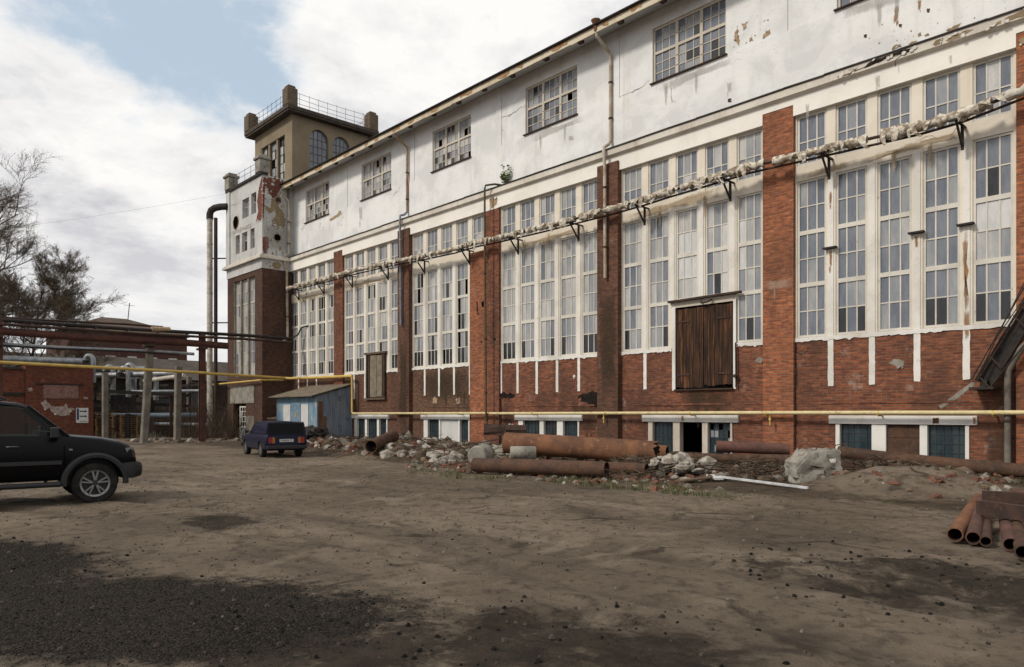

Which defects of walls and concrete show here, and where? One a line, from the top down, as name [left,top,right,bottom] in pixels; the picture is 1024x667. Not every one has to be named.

peeling [733,19,771,53]
peeling [837,9,1024,78]
peeling [256,177,290,269]